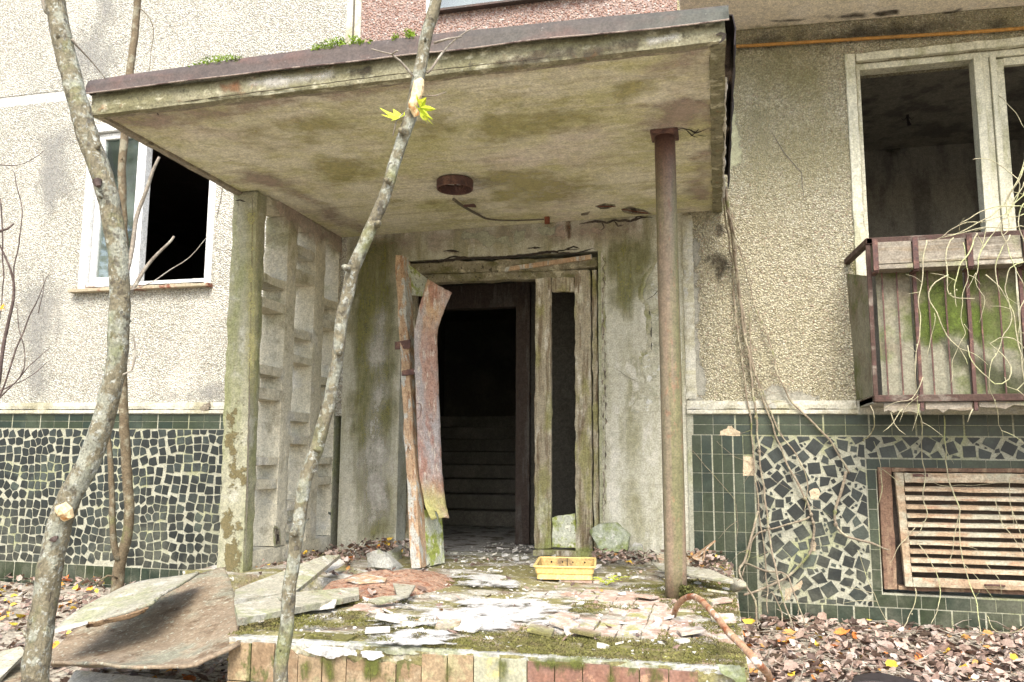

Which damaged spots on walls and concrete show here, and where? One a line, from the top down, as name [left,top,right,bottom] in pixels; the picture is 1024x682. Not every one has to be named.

crack [418,216,653,263]